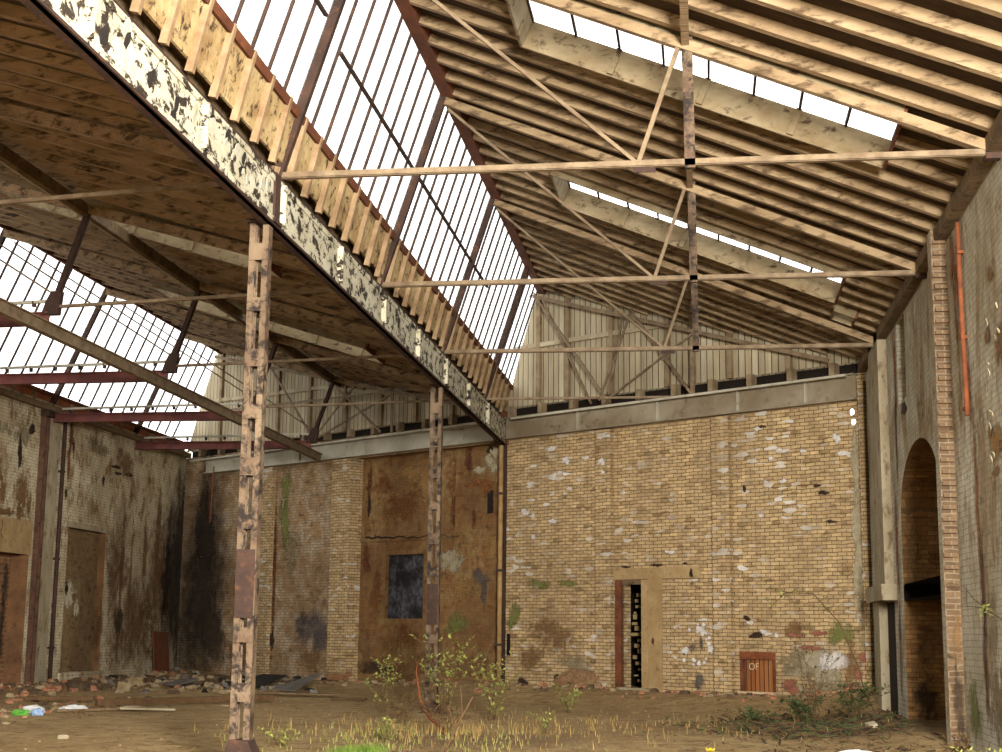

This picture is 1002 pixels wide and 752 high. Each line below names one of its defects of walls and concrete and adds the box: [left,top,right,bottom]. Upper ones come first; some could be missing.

peeling [95,7,156,88]
peeling [224,129,271,192]
peeling [984,318,1002,376]
peeling [0,424,36,520]
corrosion [949,240,989,726]
spalling [988,410,1002,477]
damp [196,493,212,557]
damp [93,486,185,664]
damp [269,500,300,651]
damp [204,612,246,666]
peeling [673,618,713,689]
spalling [787,630,827,650]